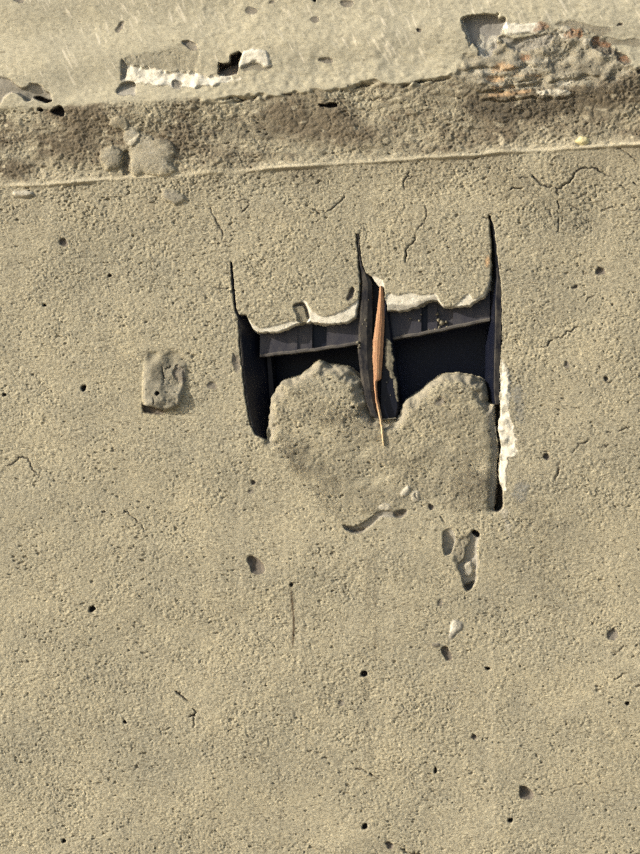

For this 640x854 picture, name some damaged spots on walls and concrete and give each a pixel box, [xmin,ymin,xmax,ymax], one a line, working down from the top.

spalling [458,14,640,98]
spalling [0,77,52,104]
spalling [117,60,241,96]
crack [510,148,639,233]
spalling [371,274,492,313]
spalling [246,300,360,335]
spalling [498,362,518,491]
peeling [400,485,419,502]
spalling [343,503,407,533]
spalling [443,528,480,590]